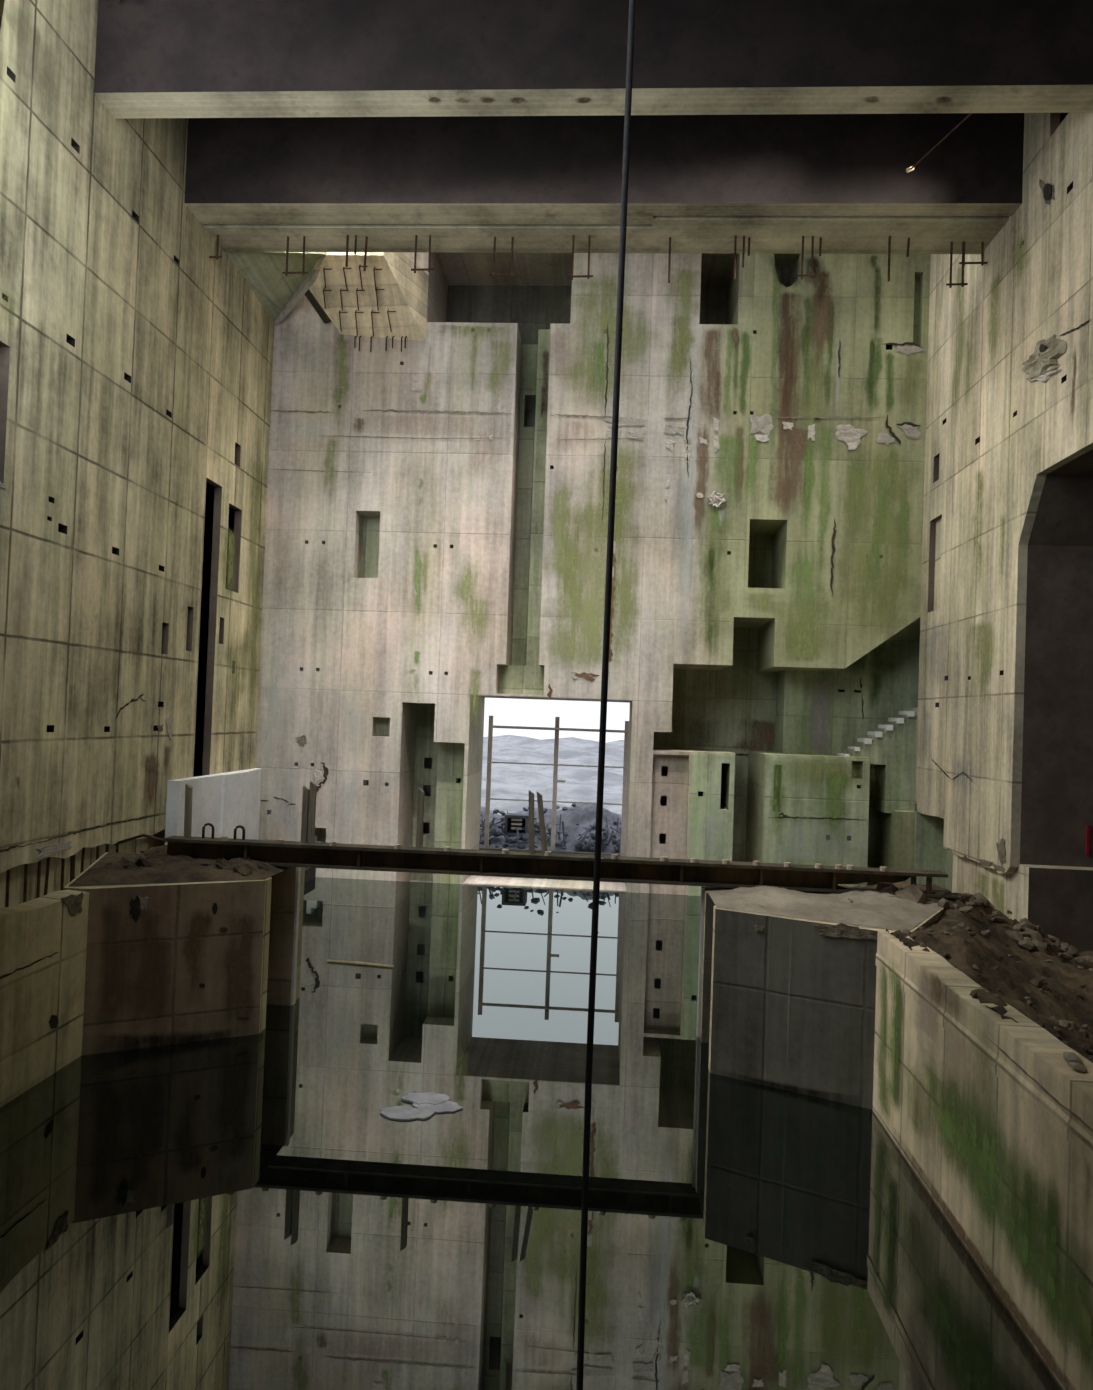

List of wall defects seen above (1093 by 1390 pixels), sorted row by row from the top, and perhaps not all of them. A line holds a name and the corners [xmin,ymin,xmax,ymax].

water stain [571,281,645,392]
spalling [664,361,720,501]
rust [694,329,738,527]
rust [734,428,743,490]
spalling [749,414,815,442]
rust [775,272,832,511]
spalling [836,424,921,450]
rust [569,541,616,683]
water stain [553,454,633,663]
crack [829,519,837,596]
spalling [5,834,164,916]
water stain [878,970,916,1125]